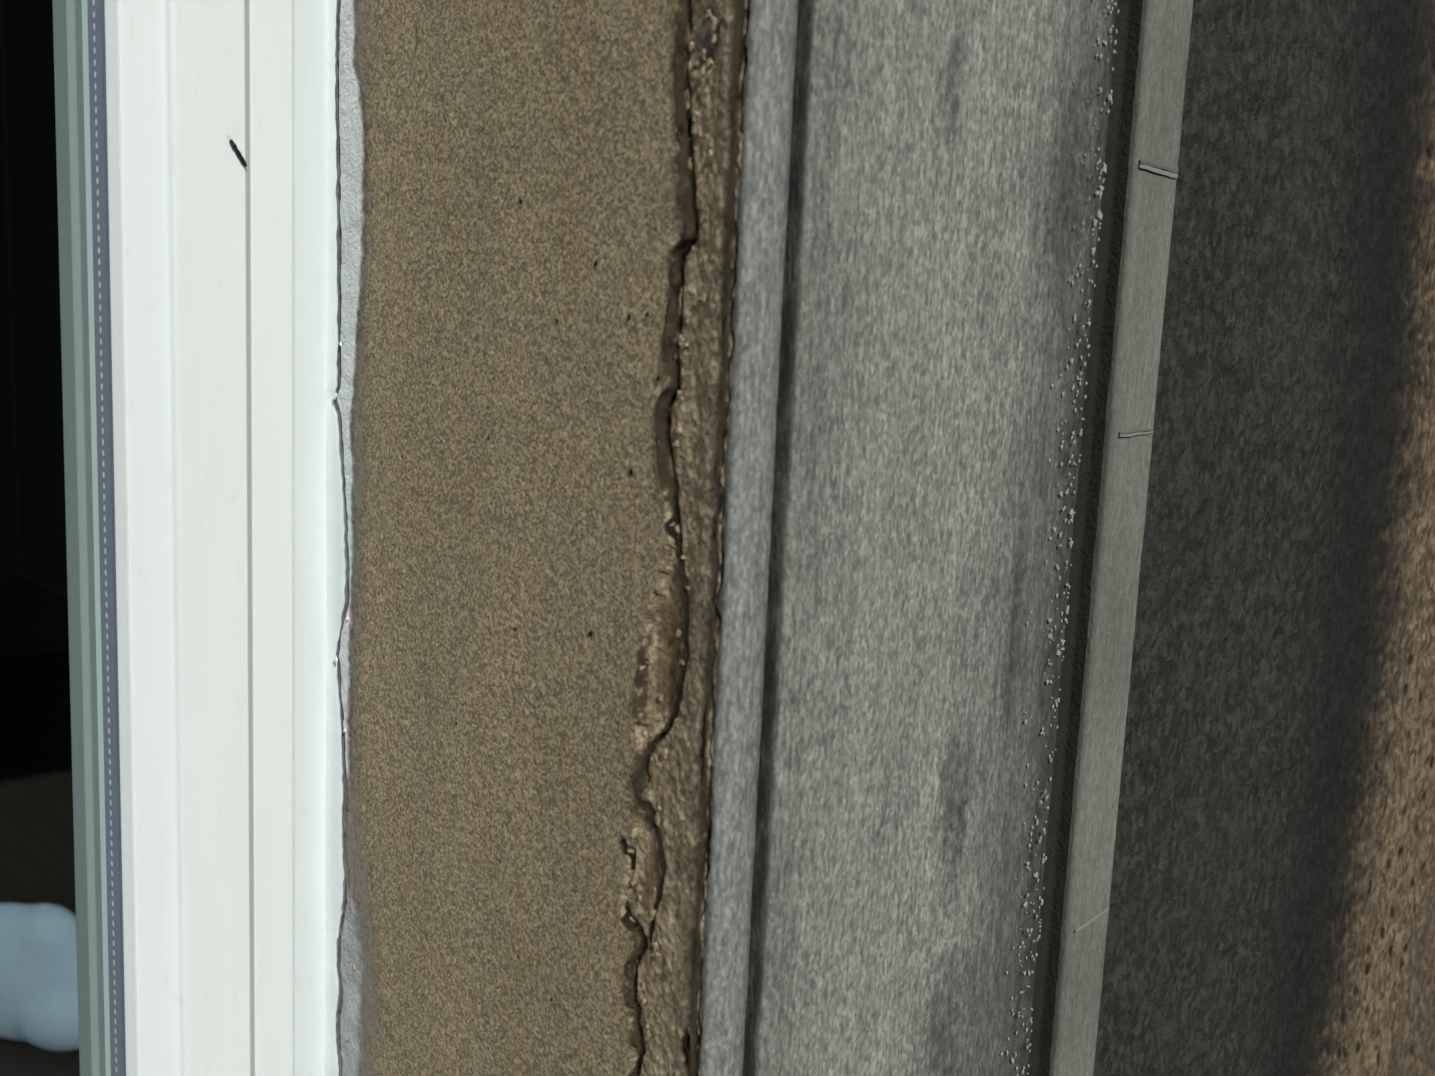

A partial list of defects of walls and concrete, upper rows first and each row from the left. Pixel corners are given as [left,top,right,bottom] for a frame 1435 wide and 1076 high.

crack [334,0,349,1076]
crack [621,0,751,1076]